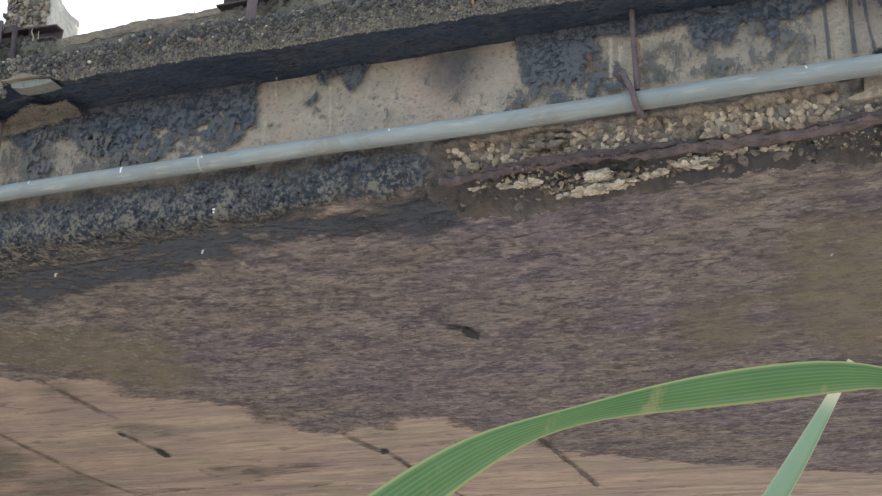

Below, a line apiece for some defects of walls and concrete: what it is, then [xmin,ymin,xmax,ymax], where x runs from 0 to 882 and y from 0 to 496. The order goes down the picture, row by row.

water stain [0,147,466,313]
spalling [0,75,882,434]
crack [37,380,165,456]
crack [345,435,457,468]
crack [538,438,599,489]
spalling [536,394,827,468]
spalling [805,389,882,474]